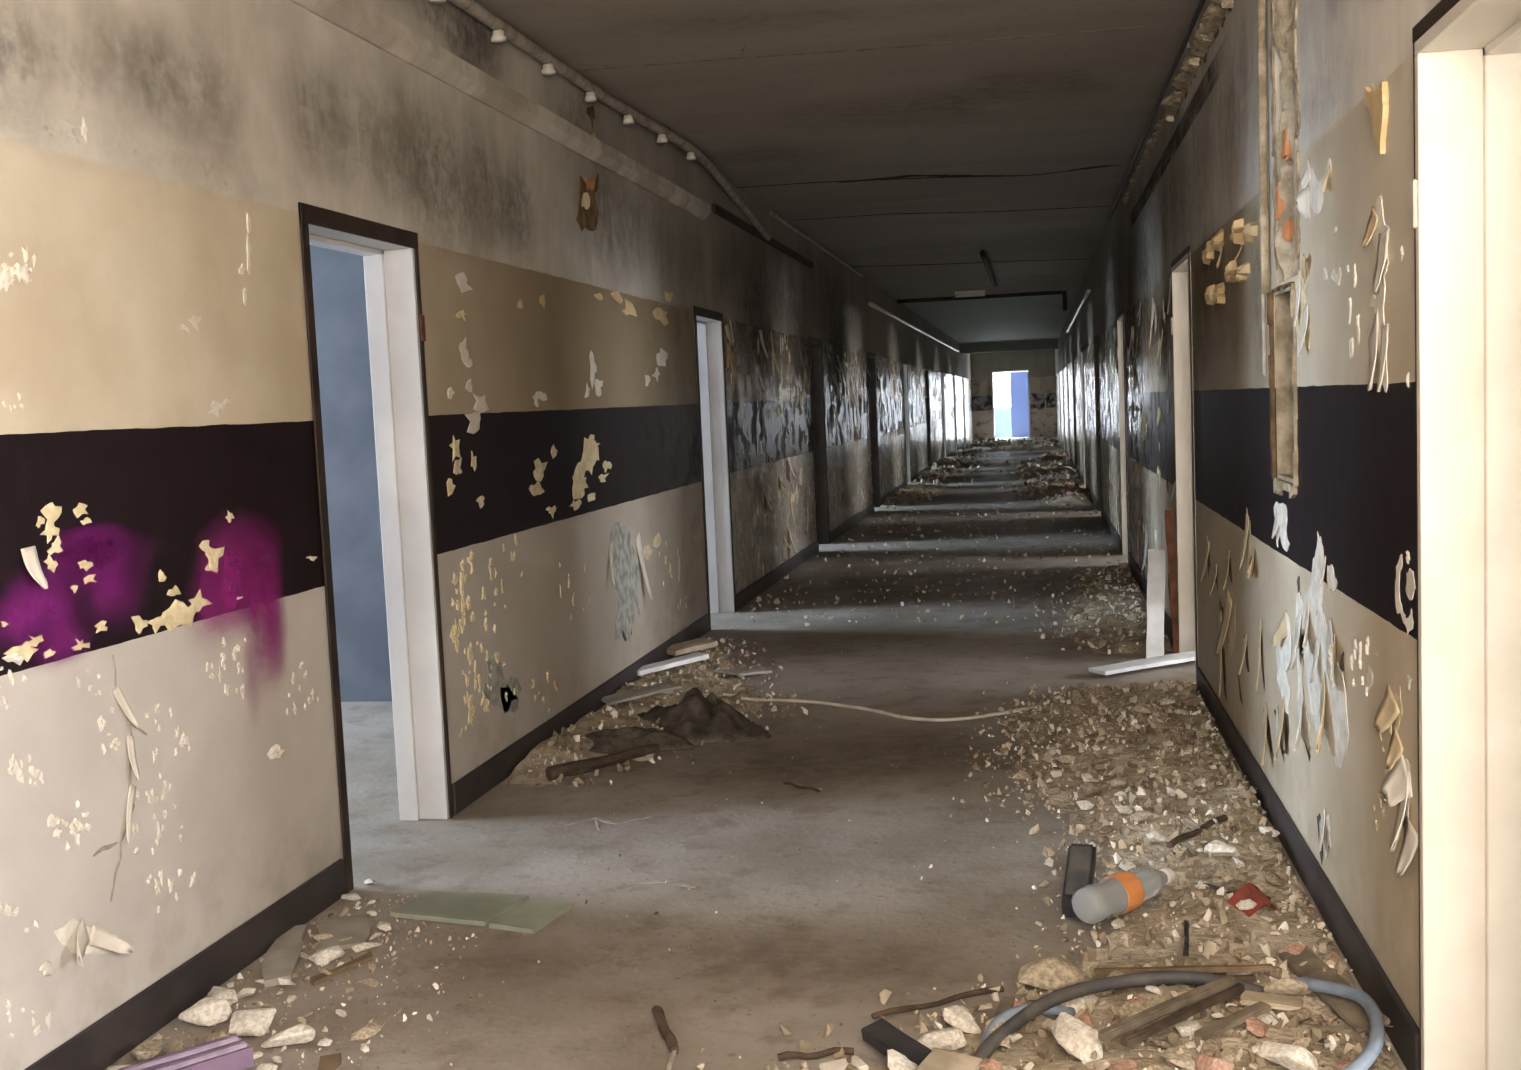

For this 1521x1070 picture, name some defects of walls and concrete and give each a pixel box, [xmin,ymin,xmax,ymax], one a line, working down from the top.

flaking render [1202,0,1409,393]
peeling [446,272,489,496]
peeling [529,434,612,518]
spalling [2,620,107,665]
spalling [20,502,92,589]
spalling [70,560,96,593]
spalling [131,570,212,634]
spalling [199,540,224,573]
peeling [1200,501,1349,768]
crack [93,654,148,902]
peeling [1367,666,1418,877]
peeling [54,917,135,967]